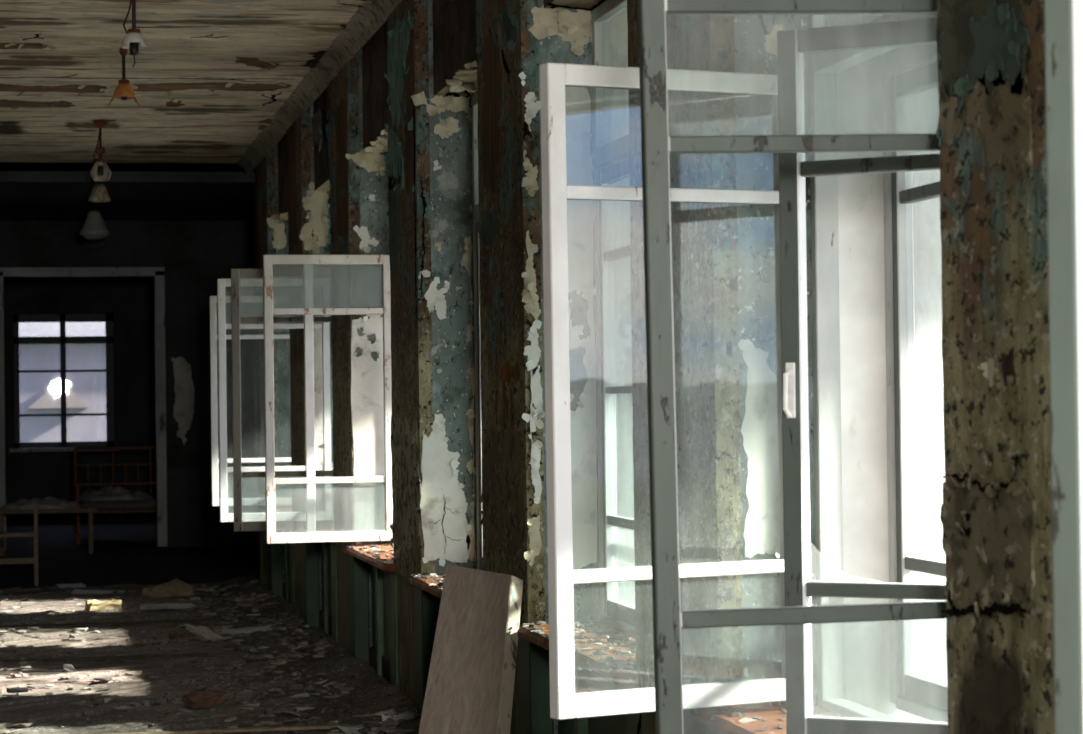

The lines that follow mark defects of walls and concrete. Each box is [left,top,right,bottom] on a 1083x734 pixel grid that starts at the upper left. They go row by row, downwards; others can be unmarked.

peeling [0,43,56,53]
peeling [235,57,279,71]
peeling [0,84,107,110]
peeling [131,82,292,107]
peeling [266,4,593,282]
peeling [313,322,333,477]
peeling [347,204,545,591]
peeling [567,200,598,570]
crack [941,454,1018,492]
crack [430,495,461,554]
crack [941,589,1030,617]